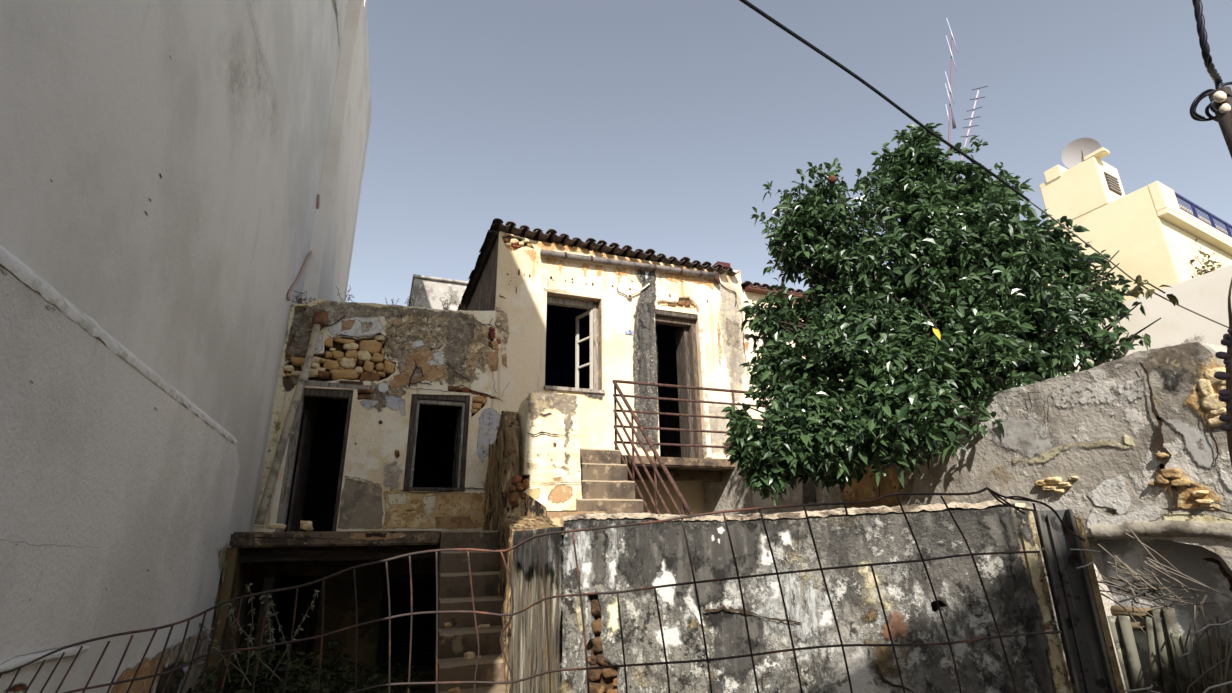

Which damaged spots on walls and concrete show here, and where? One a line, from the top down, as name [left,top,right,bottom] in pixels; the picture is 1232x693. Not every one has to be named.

peeling [283,269,531,424]
flaking render [345,450,486,540]
peeling [477,408,500,463]
damp [633,269,659,452]
damp [703,283,746,454]
crack [1140,362,1232,514]
flaking render [1155,356,1232,510]
damp [512,513,801,693]